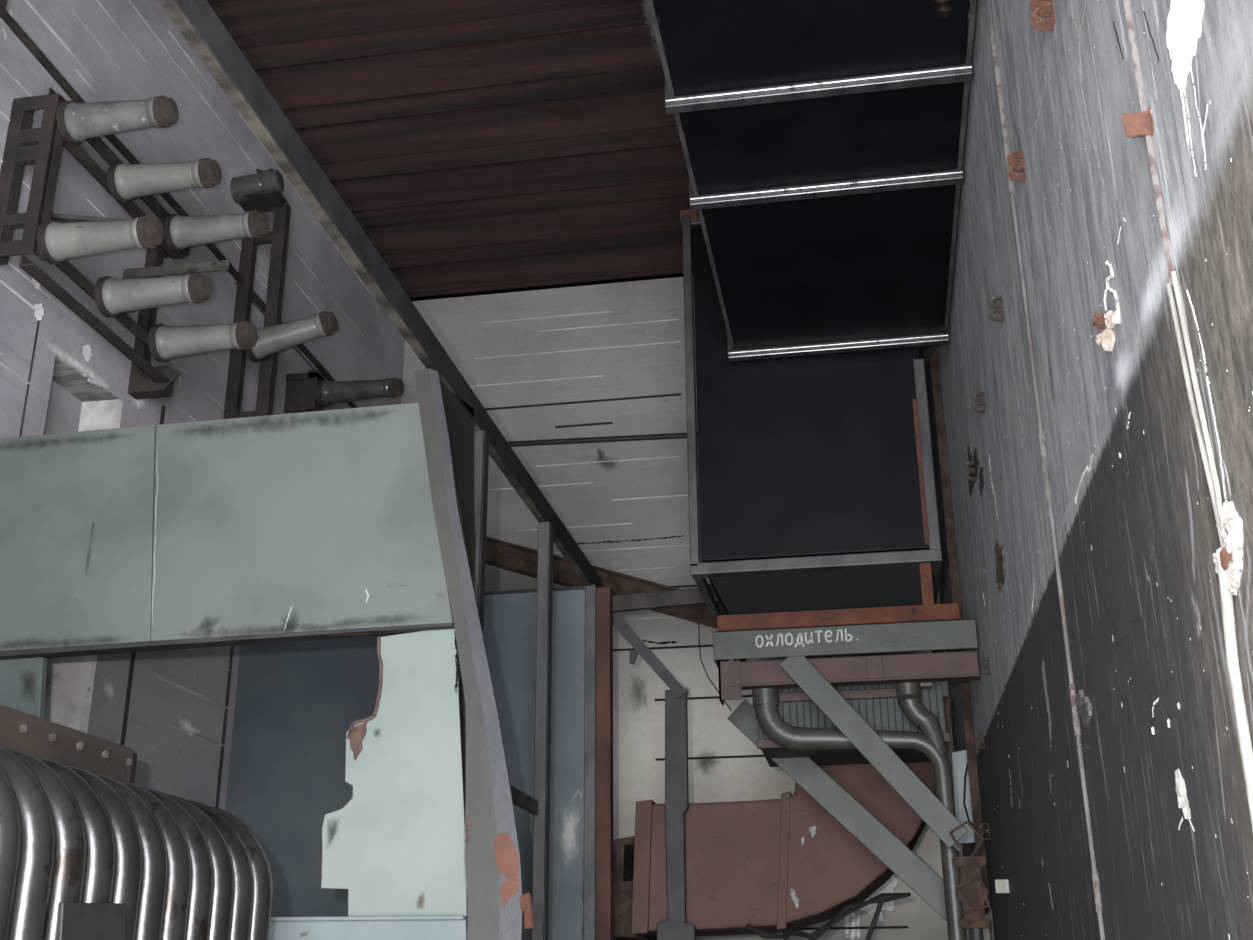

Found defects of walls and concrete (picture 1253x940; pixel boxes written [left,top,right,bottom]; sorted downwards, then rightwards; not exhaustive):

peeling [1166,0,1208,176]
peeling [1092,260,1121,351]
spalling [1213,501,1244,595]
peeling [1175,769,1194,831]